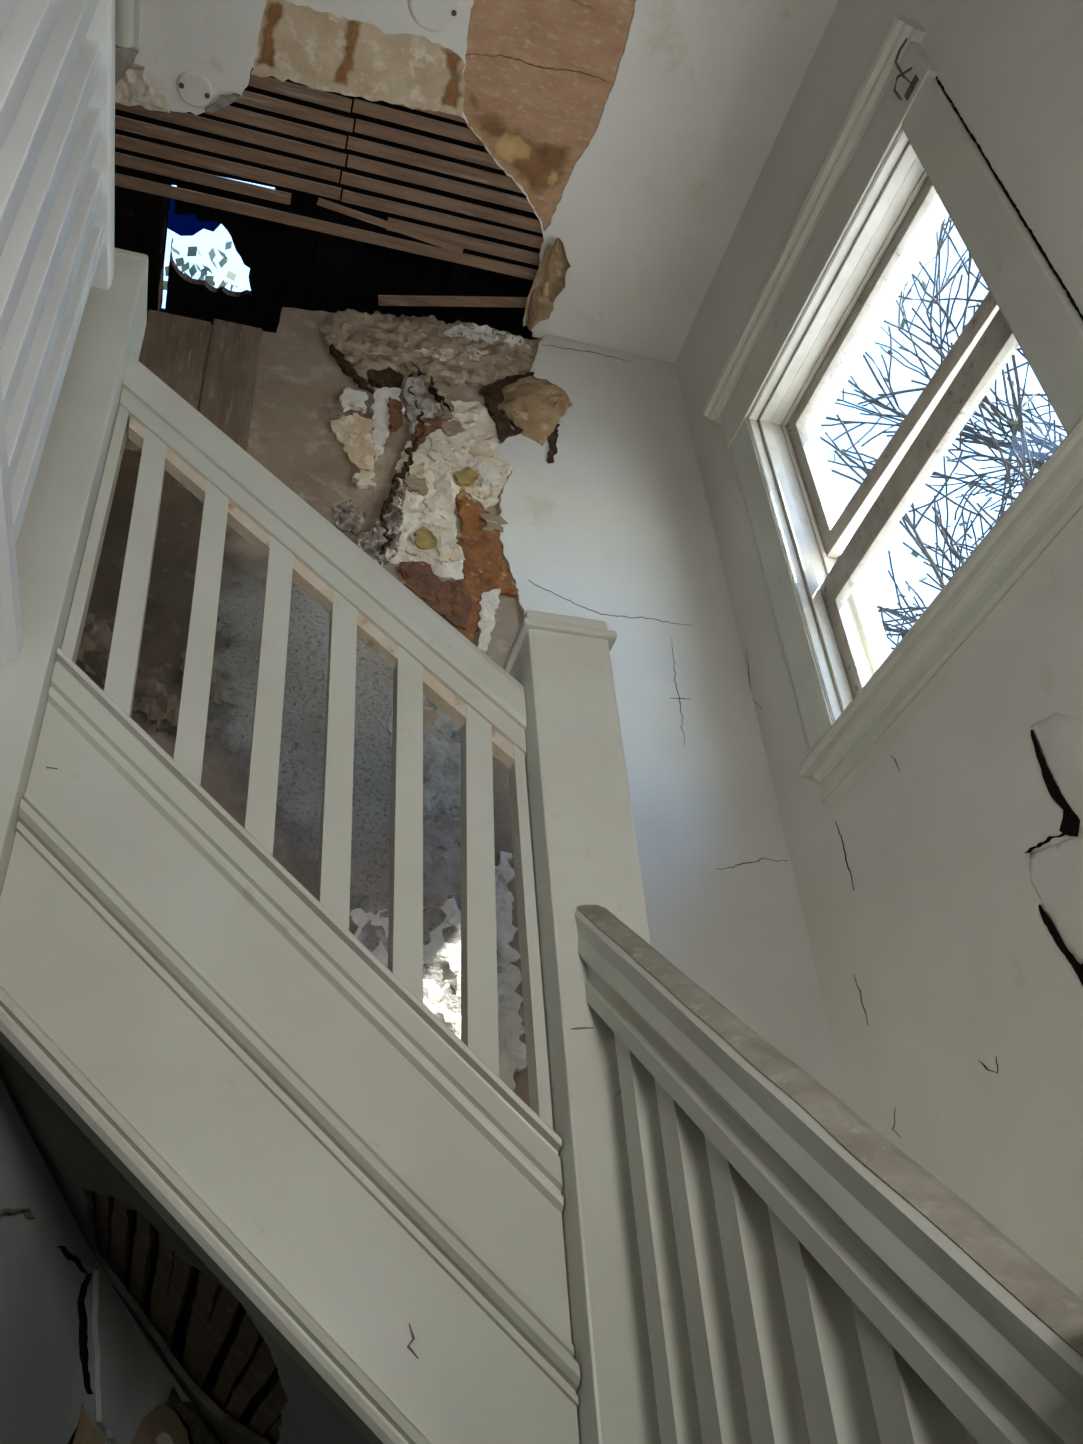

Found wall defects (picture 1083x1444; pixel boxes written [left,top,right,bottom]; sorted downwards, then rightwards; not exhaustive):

flaking render [115,45,171,113]
flaking render [205,93,240,113]
flaking render [251,0,635,581]
flaking render [477,589,501,654]
crack [529,580,692,745]
crack [717,858,788,869]
crack [1024,833,1065,853]
crack [0,1208,36,1219]
crack [56,1246,93,1394]
peeling [73,1270,194,1444]